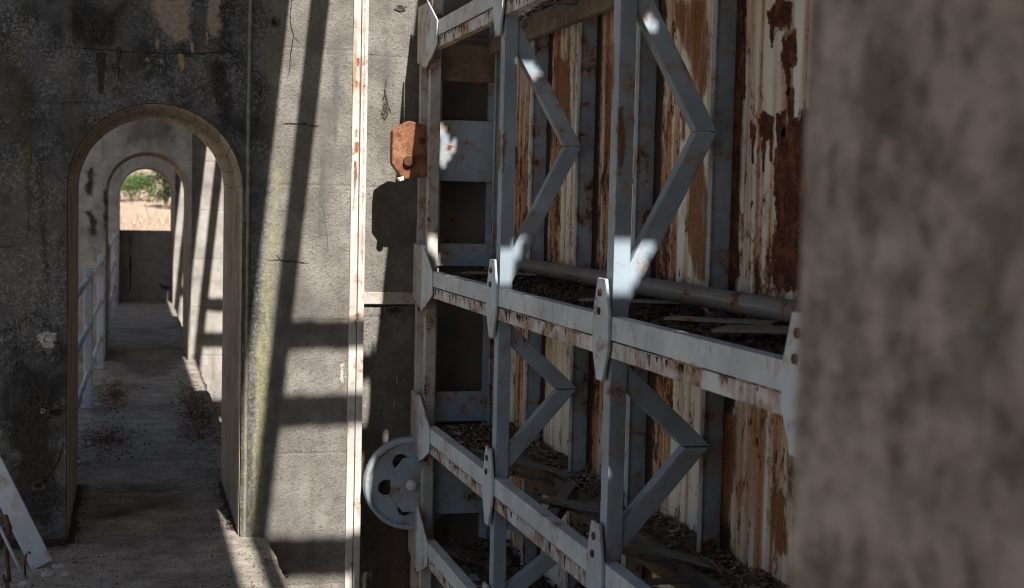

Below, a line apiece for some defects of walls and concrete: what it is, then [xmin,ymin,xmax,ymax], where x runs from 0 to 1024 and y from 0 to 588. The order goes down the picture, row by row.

water stain [71,6,123,94]
rust [675,0,708,99]
rust [354,113,364,200]
rust [728,0,806,293]
rust [685,161,708,282]
rust [630,349,695,375]
rust [721,412,740,525]
rust [767,489,787,555]